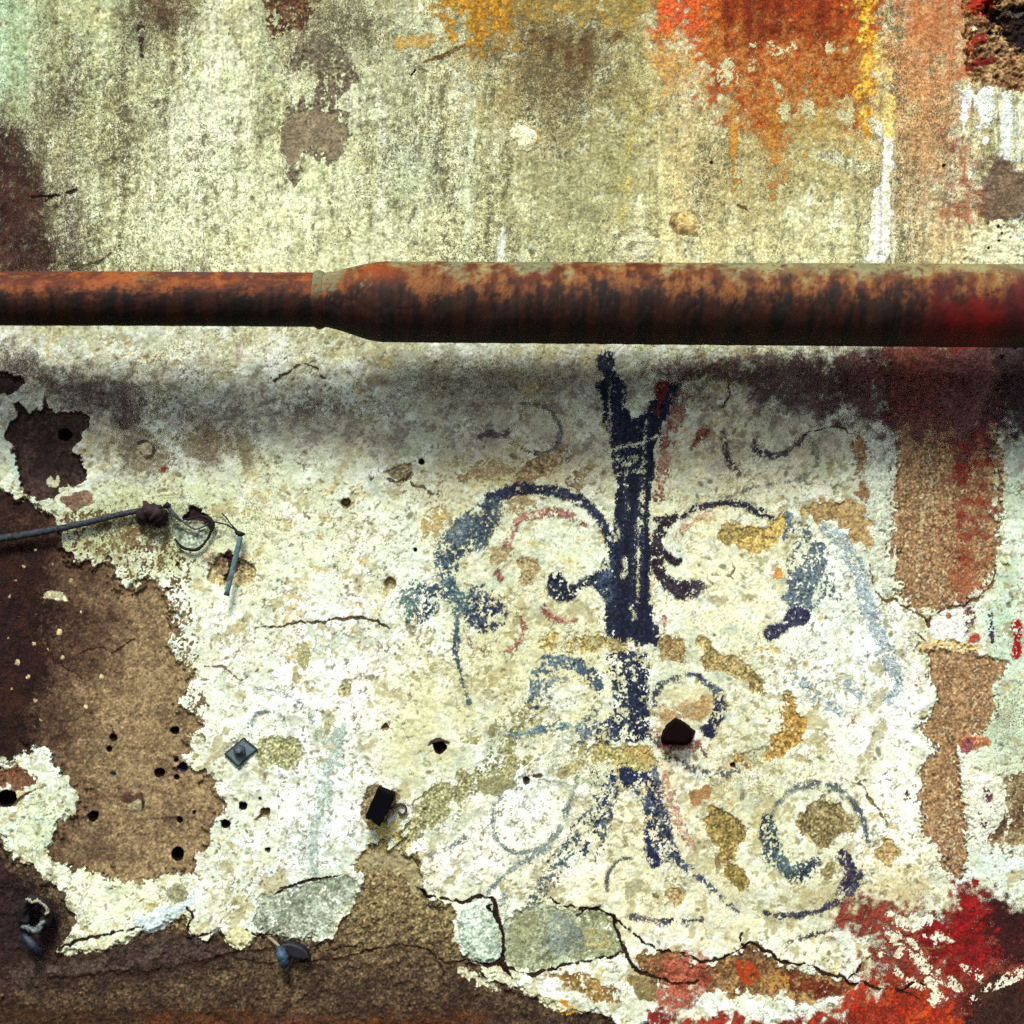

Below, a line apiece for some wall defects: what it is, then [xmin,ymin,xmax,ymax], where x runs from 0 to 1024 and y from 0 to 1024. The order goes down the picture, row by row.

rust [393,0,973,202]
rust [932,128,989,223]
crack [255,616,390,629]
spalling [0,371,856,1024]
spalling [800,347,1024,880]
crack [47,888,952,1000]